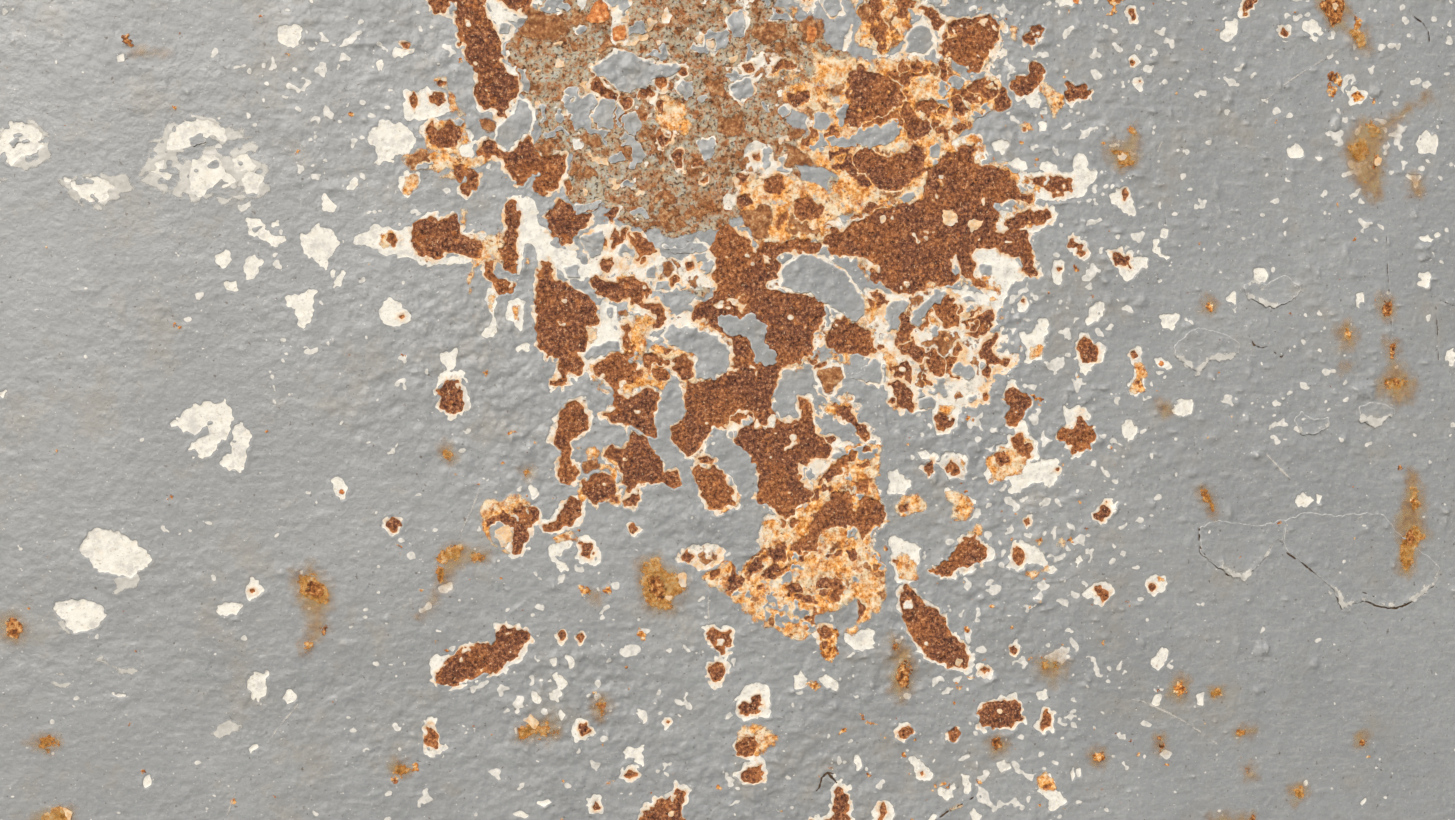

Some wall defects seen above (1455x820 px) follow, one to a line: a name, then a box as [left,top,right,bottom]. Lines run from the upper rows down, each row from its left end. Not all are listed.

rust [1319,0,1366,48]
peeling [58,114,270,210]
rust [1327,71,1382,192]
peeling [215,0,1172,680]
peeling [170,399,252,473]
peeling [53,528,152,638]
rust [419,544,486,593]
rust [639,557,687,610]
crack [1269,547,1435,609]
peeling [429,621,535,691]
rust [794,628,875,691]
peeling [701,624,778,785]